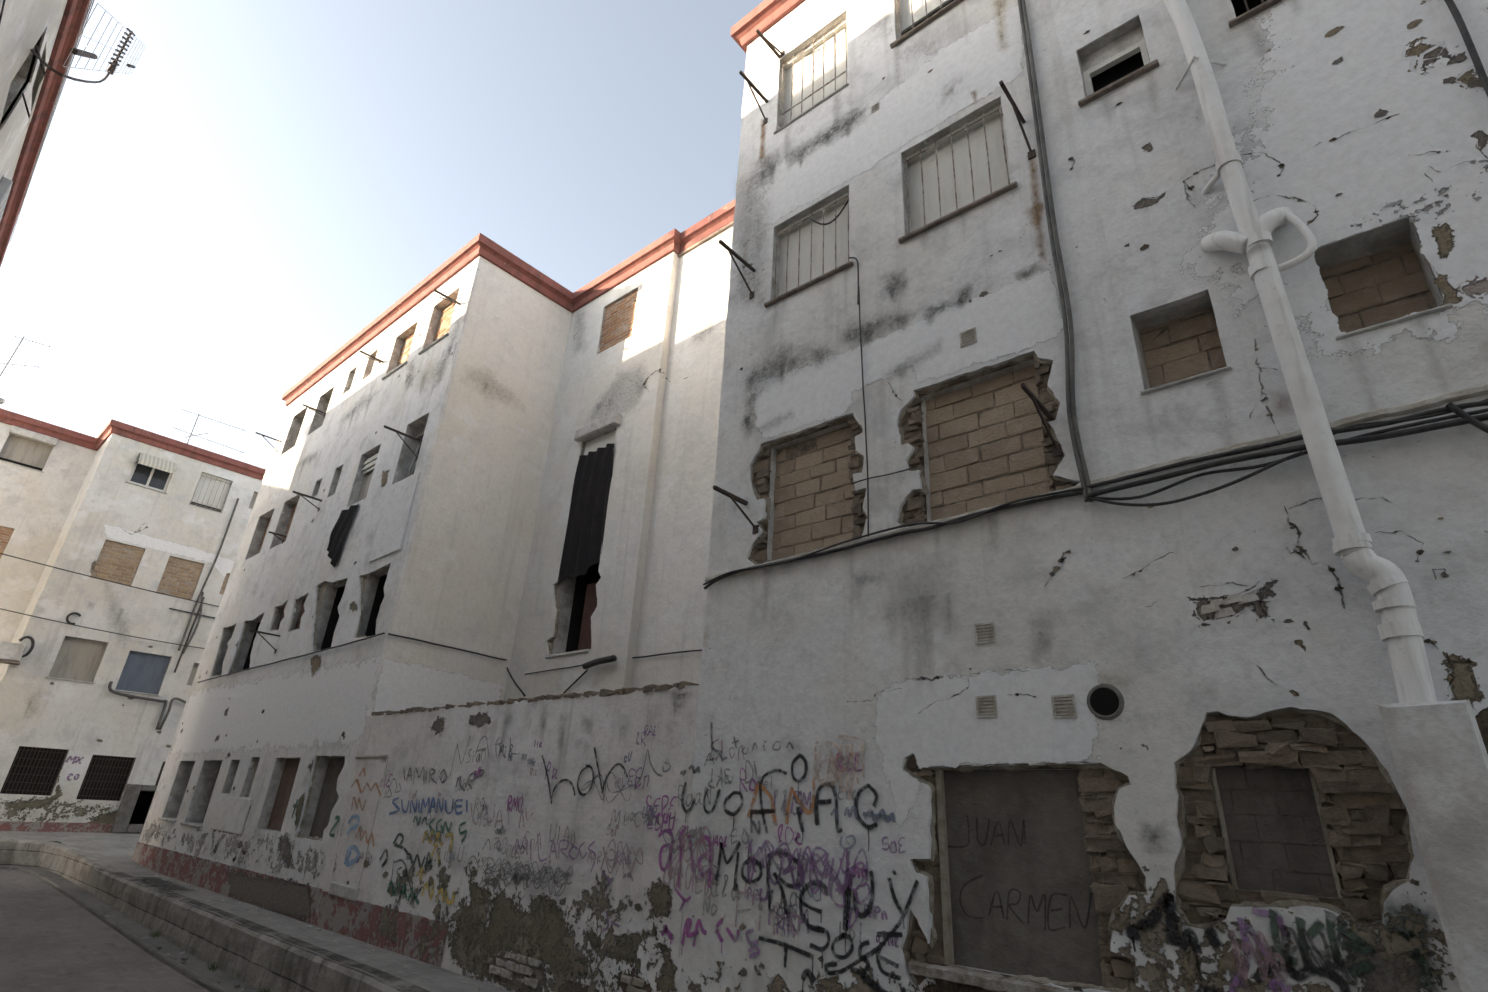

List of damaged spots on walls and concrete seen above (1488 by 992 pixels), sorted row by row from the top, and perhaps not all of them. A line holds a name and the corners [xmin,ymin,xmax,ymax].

flaking render [1400,0,1487,92]
flaking render [750,447,772,564]
flaking render [848,418,867,540]
flaking render [899,394,928,527]
crack [1199,582,1272,615]
peeling [1180,574,1310,651]
crack [1284,497,1449,609]
flaking render [466,707,496,733]
flaking render [907,757,936,787]
flaking render [1428,644,1488,754]
flaking render [1077,713,1456,992]
peeling [363,848,993,992]